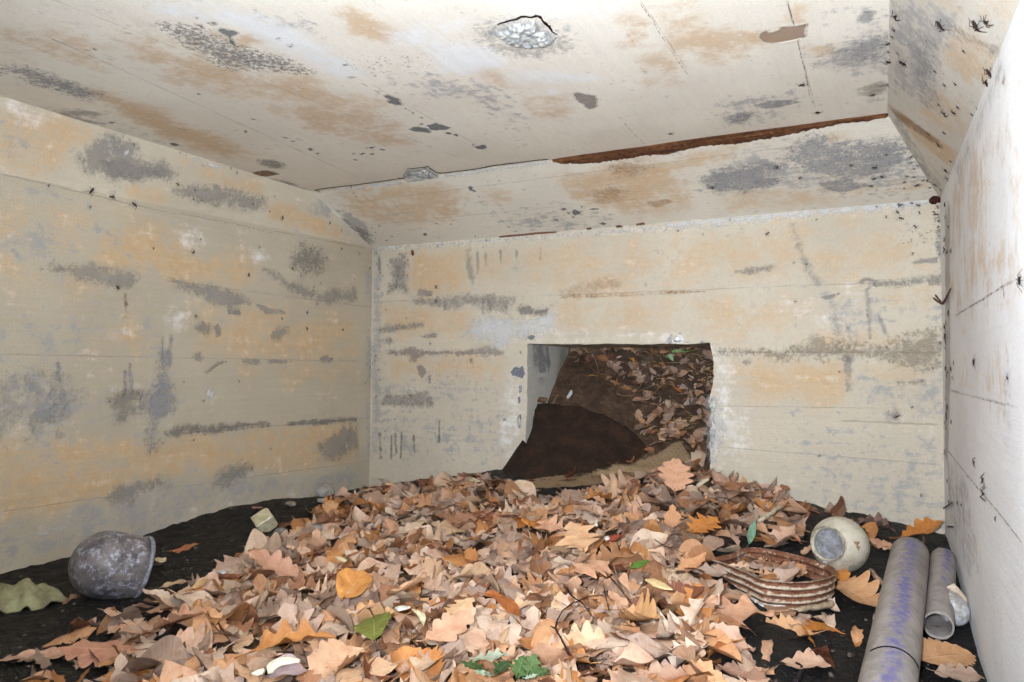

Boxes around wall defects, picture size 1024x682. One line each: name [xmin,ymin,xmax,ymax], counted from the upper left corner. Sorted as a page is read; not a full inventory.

spalling [492,21,556,49]
peeling [757,23,809,44]
leakage [79,135,171,182]
leakage [705,135,908,192]